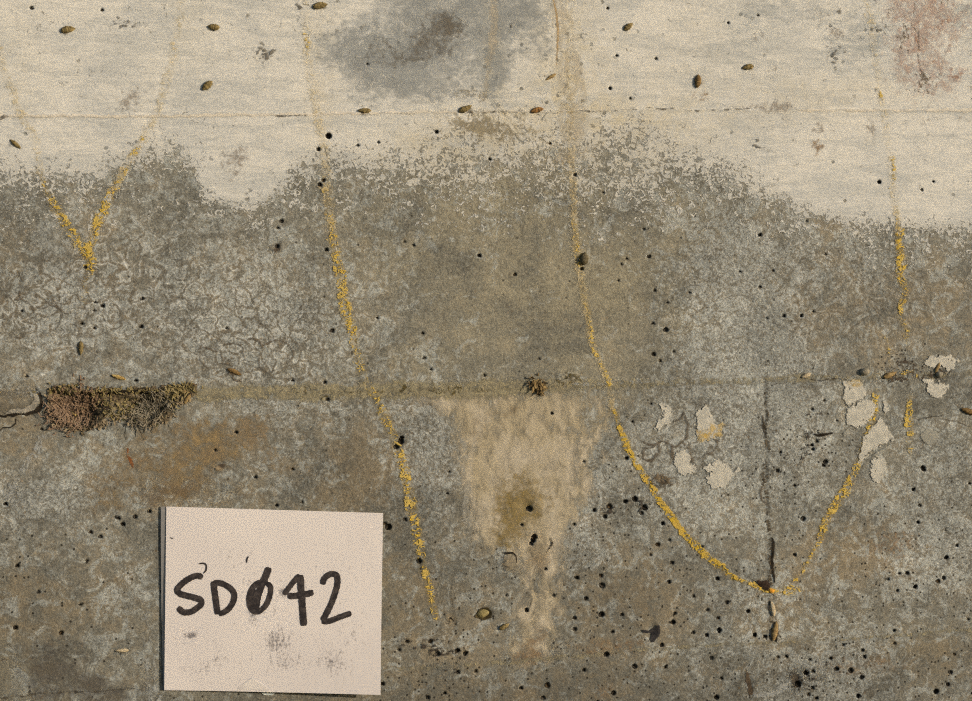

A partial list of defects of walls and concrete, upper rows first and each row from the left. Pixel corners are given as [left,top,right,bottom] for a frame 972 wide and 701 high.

leakage [0,0,544,142]
peeling [922,354,959,398]
crack [0,388,43,431]
peeling [654,403,672,431]
peeling [695,405,724,442]
peeling [843,379,894,484]
peeling [674,449,740,489]
leakage [195,378,688,666]
crack [760,382,779,642]